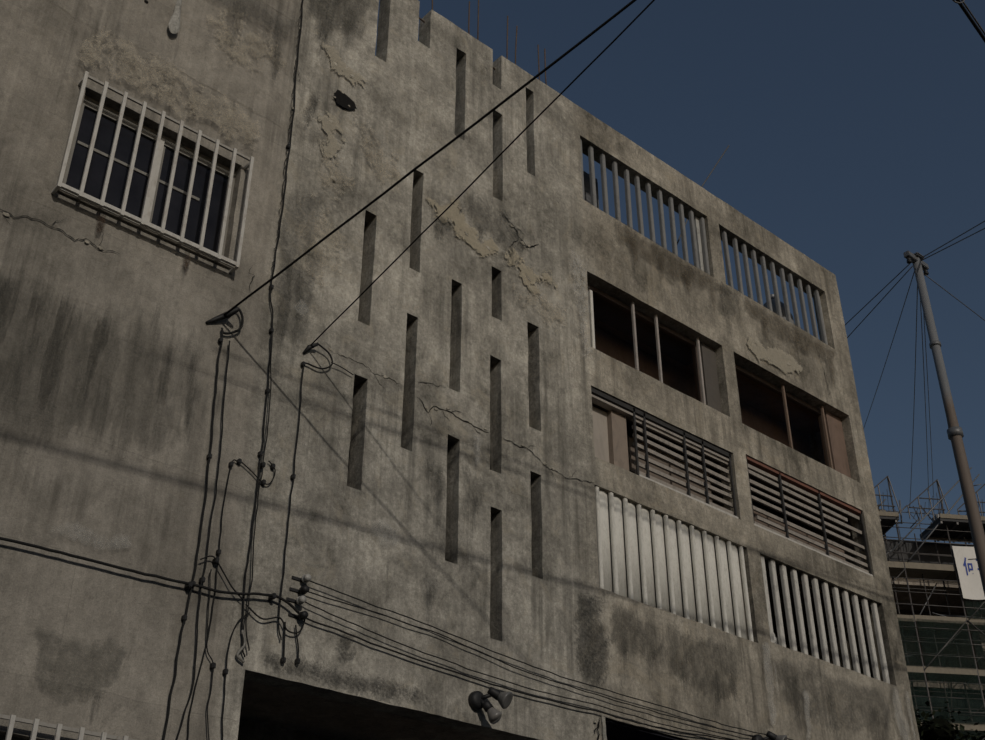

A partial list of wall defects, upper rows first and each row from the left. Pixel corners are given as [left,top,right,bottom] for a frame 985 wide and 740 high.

spalling [316,90,359,159]
crack [0,209,118,253]
spalling [426,196,558,295]
spalling [747,336,803,374]
crack [329,347,594,483]